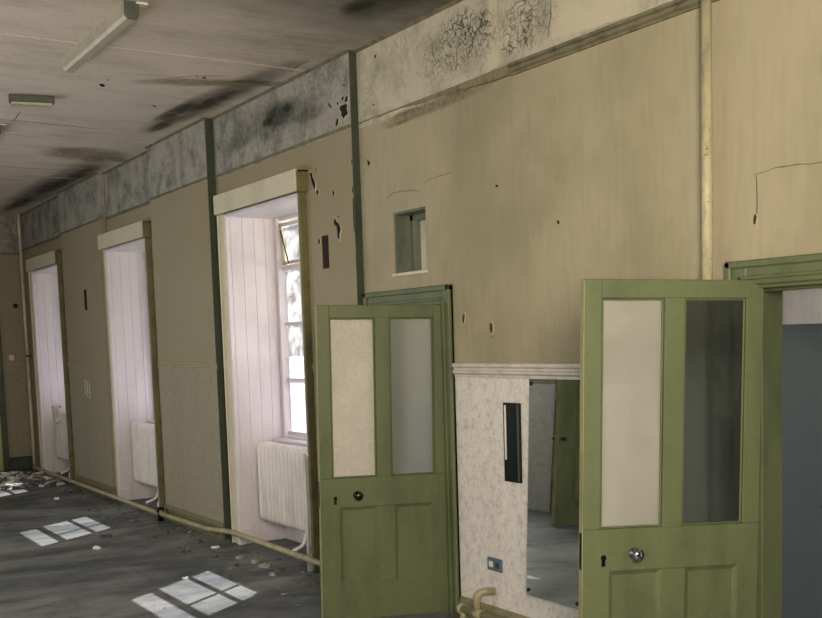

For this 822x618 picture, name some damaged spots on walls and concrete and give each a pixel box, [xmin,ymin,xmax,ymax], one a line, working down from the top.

crack [432,12,487,66]
crack [503,0,551,50]
peeling [328,84,349,127]
crack [754,161,822,220]